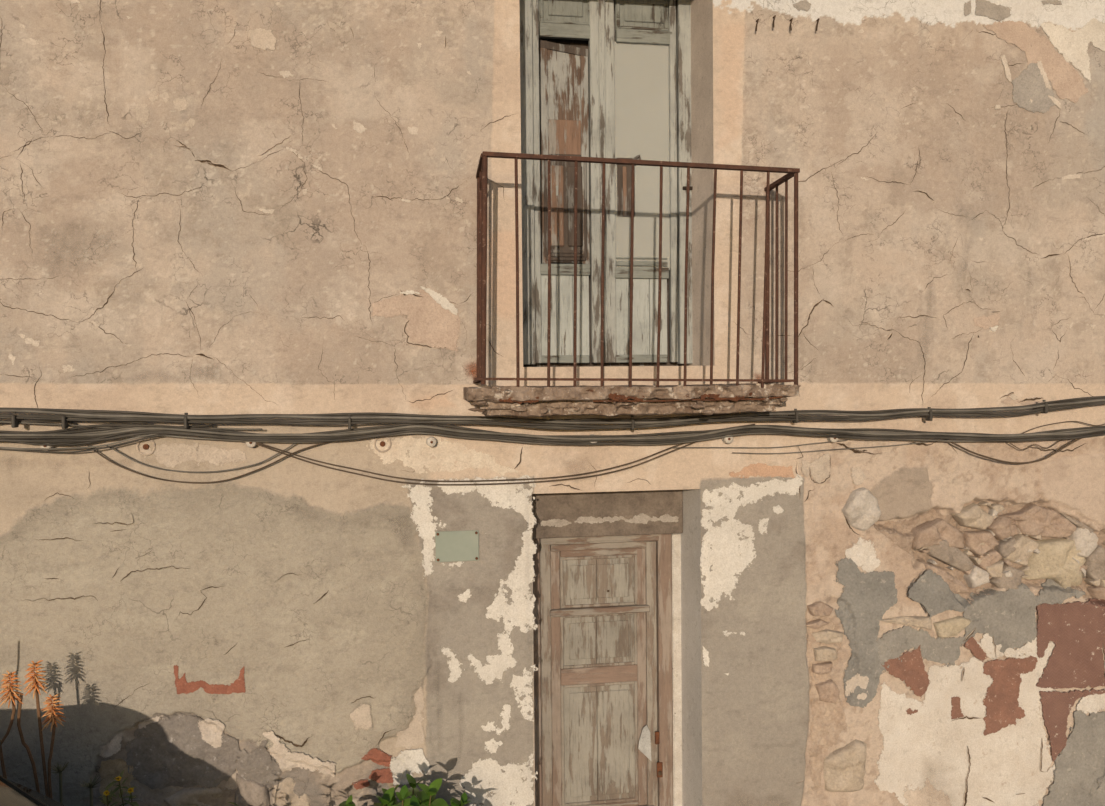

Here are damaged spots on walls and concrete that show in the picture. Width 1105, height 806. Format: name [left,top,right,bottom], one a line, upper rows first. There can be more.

peeling [793,0,811,12]
peeling [964,0,1105,108]
crack [1,0,502,404]
crack [778,104,1105,400]
spalling [371,286,460,352]
spalling [593,392,783,402]
crack [35,513,134,541]
crack [21,551,222,615]
peeling [366,434,679,806]
peeling [700,453,831,611]
peeling [805,500,1105,806]
spalling [99,713,336,806]